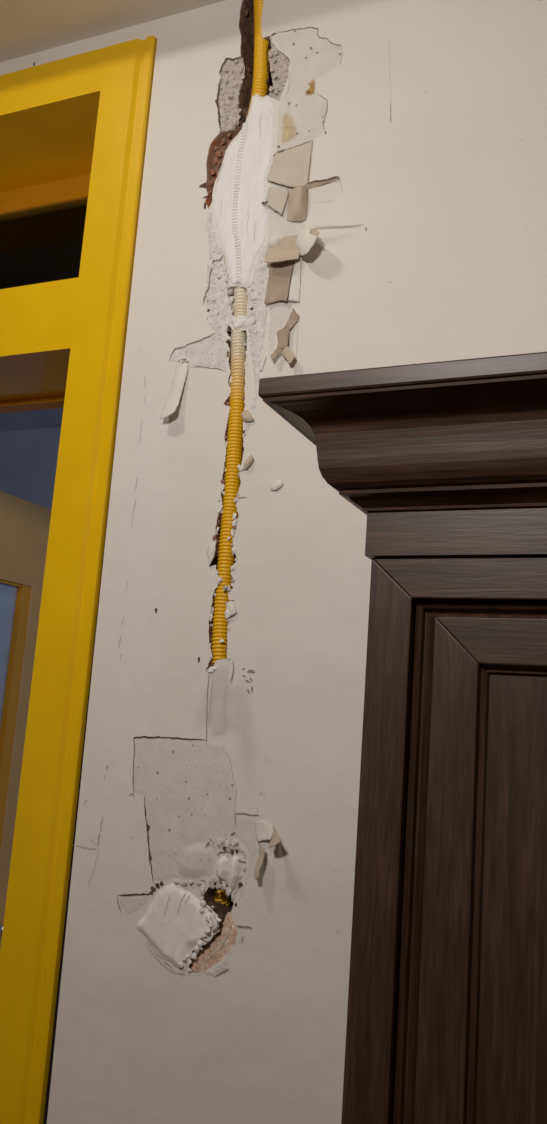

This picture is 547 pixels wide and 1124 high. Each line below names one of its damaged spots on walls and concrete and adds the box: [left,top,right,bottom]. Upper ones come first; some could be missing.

peeling [268,27,342,154]
flaking render [160,57,367,437]
peeling [198,451,254,663]
peeling [117,881,164,914]
spalling [144,813,282,977]